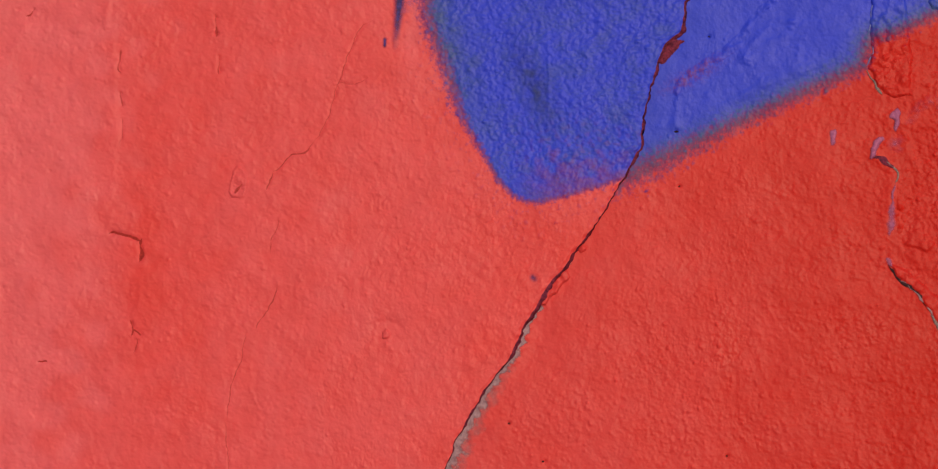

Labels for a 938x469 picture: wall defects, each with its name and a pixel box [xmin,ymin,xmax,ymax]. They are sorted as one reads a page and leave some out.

crack [445,0,690,469]